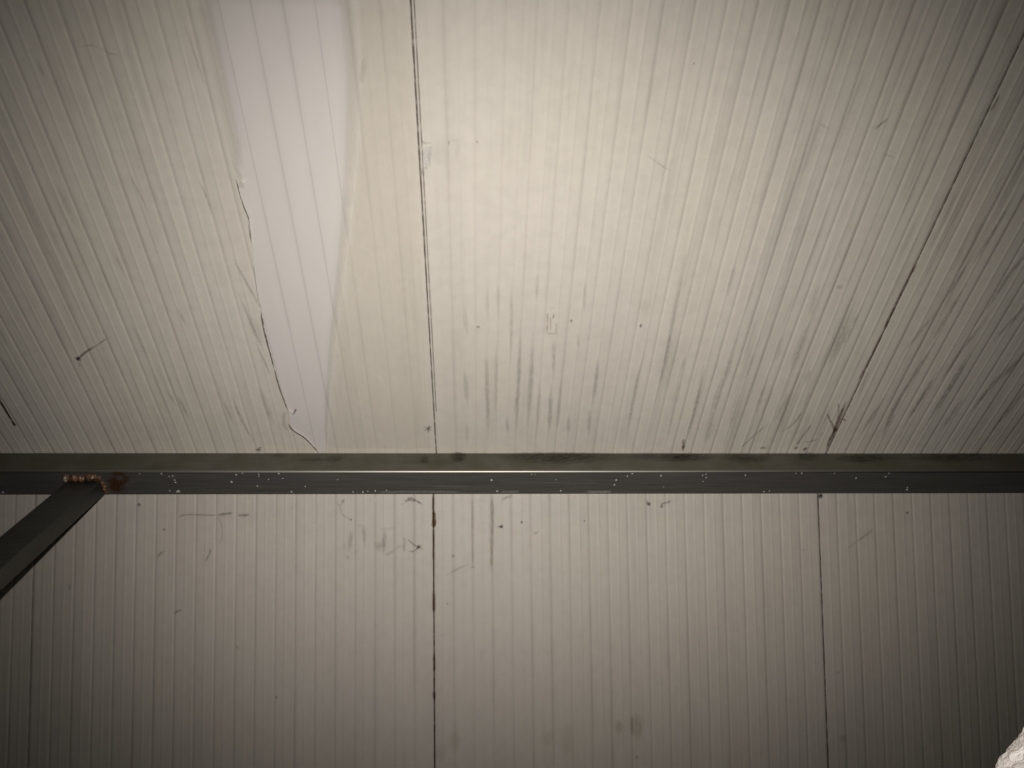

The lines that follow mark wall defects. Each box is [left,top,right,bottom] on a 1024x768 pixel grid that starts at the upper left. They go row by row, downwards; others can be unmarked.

peeling [208,0,350,451]